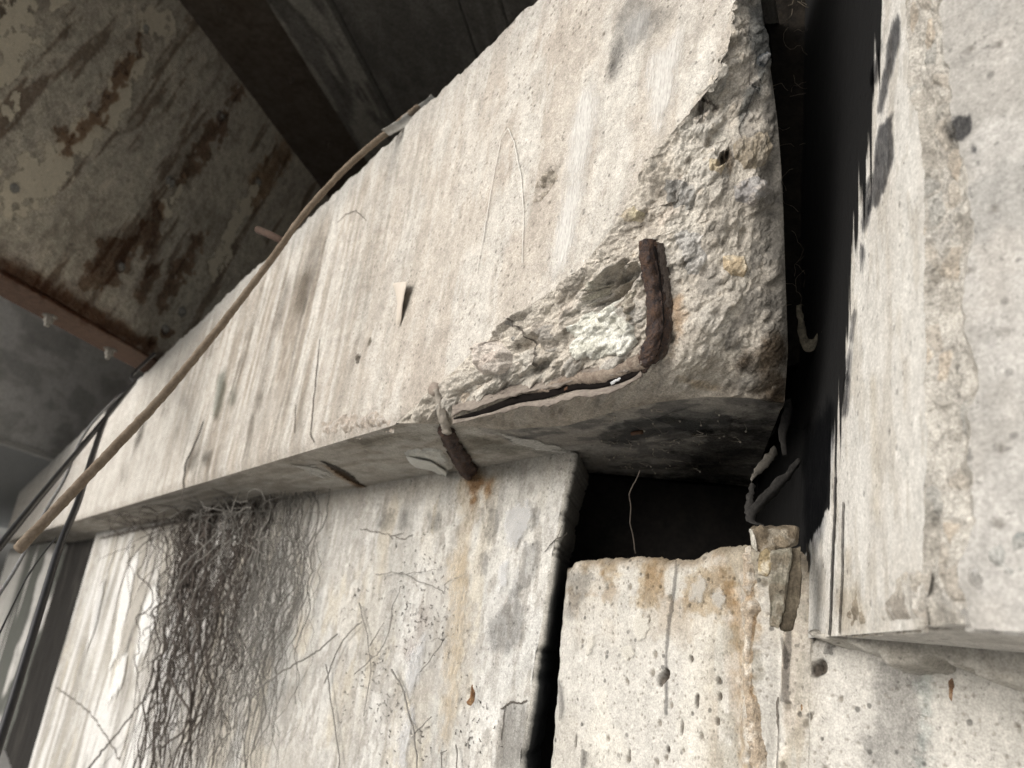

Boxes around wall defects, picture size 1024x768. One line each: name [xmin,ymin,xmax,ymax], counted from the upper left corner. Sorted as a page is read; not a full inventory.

spalling [321,0,788,454]
crack [294,339,367,487]
rust [428,238,673,481]
spalling [749,529,758,552]